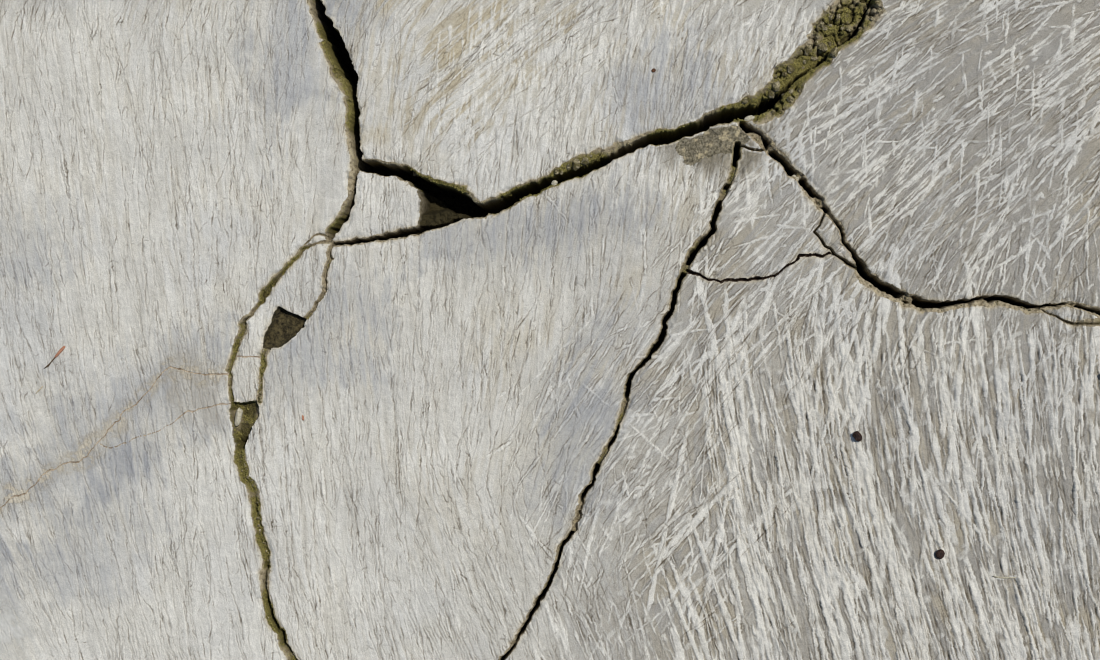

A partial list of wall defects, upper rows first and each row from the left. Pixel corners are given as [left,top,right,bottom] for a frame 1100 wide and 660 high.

crack [233,422,298,660]
crack [0,0,886,509]
crack [498,121,1100,660]